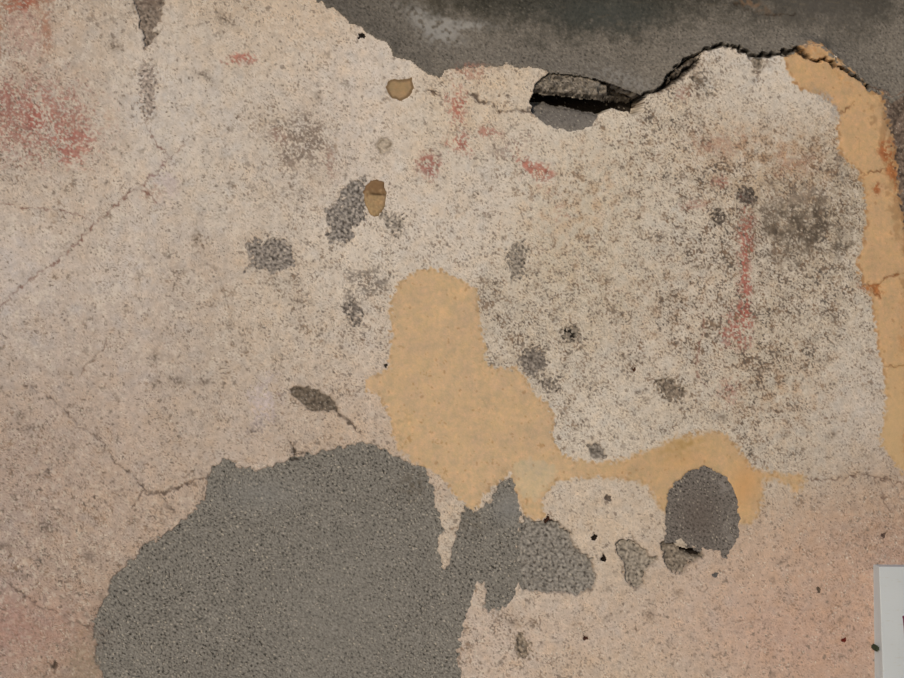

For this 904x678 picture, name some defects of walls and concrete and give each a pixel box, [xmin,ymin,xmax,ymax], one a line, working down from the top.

spalling [134,0,165,120]
spalling [529,73,632,132]
crack [630,42,871,113]
crack [144,118,190,160]
crack [859,168,884,178]
crack [0,187,137,308]
crack [78,335,113,378]
spalling [517,344,564,394]
spalling [291,386,336,412]
crack [18,383,211,513]
spalling [510,516,596,595]
spalling [615,538,702,587]